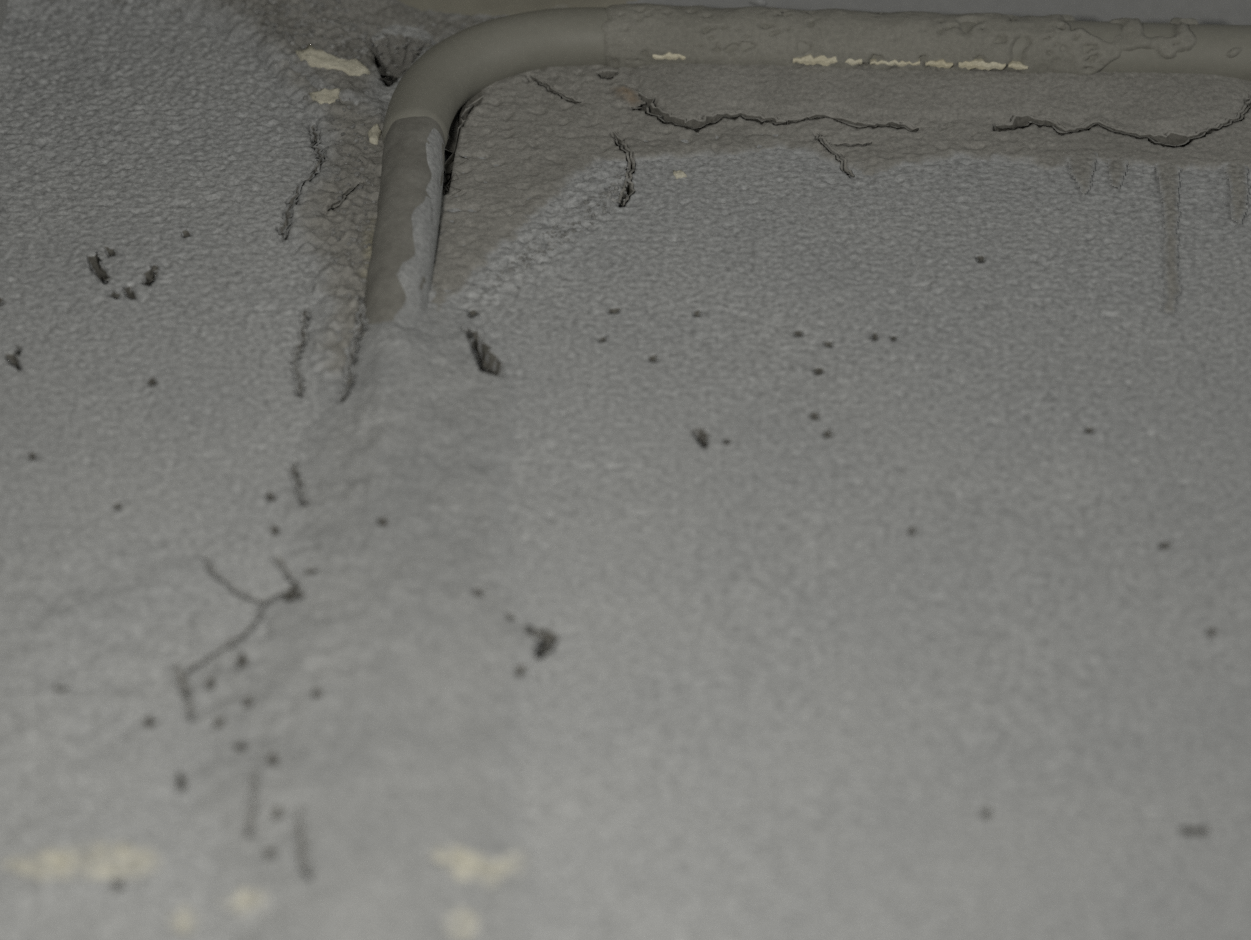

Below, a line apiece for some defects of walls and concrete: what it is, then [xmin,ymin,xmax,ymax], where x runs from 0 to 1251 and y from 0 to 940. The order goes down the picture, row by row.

crack [613,132,635,207]
crack [634,91,918,177]
crack [996,99,1251,148]